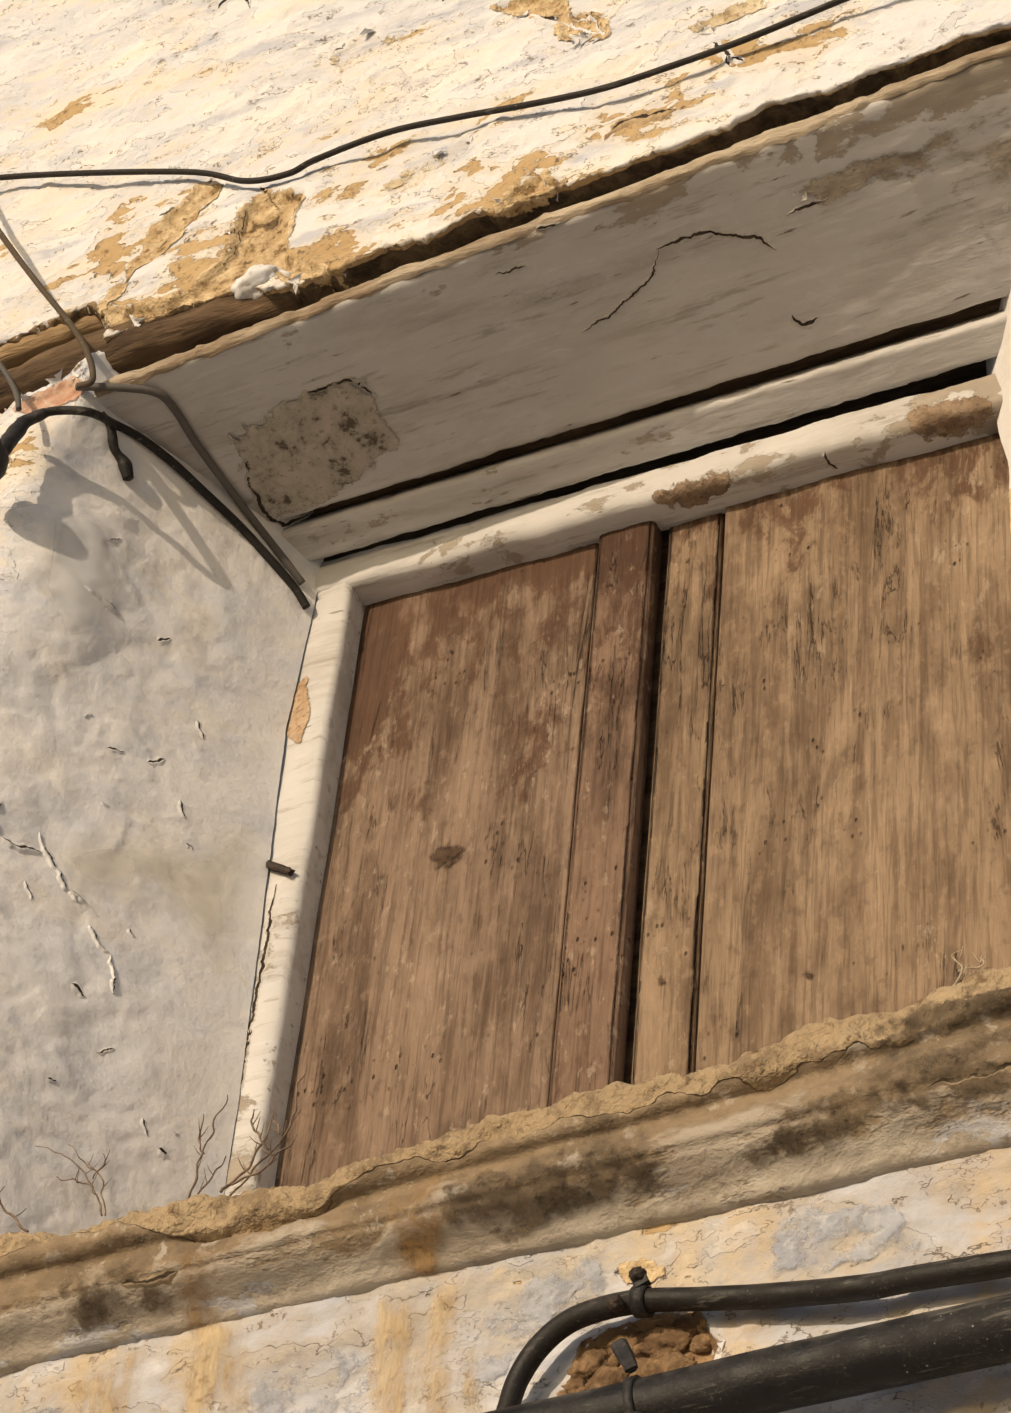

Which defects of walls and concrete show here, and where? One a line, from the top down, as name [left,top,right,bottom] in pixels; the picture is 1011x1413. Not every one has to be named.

spalling [489,0,611,49]
spalling [0,178,349,347]
crack [581,191,850,333]
spalling [14,361,84,414]
peeling [652,469,731,510]
crack [0,802,117,993]
crack [237,884,277,1113]
damp [872,987,1011,1110]
damp [746,1091,862,1162]
damp [439,1145,659,1243]
damp [59,1264,173,1329]
spalling [557,1311,726,1396]